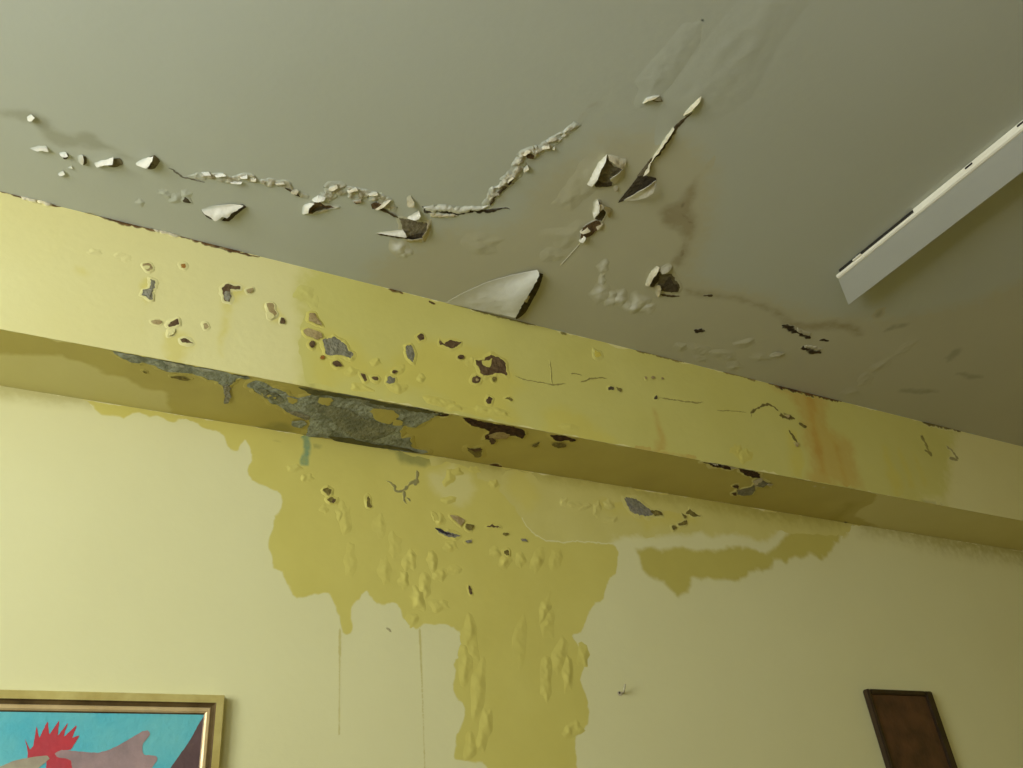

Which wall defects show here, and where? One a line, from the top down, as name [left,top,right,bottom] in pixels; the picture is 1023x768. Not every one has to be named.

peeling [30,146,123,176]
peeling [181,172,432,244]
peeling [561,96,702,265]
peeling [446,270,543,319]
peeling [645,263,683,298]
peeling [107,349,444,455]
peeling [301,311,398,386]
peeling [403,332,514,407]
crack [662,372,842,447]
rust [762,382,868,492]
crack [386,470,420,504]
damp [0,327,1023,768]